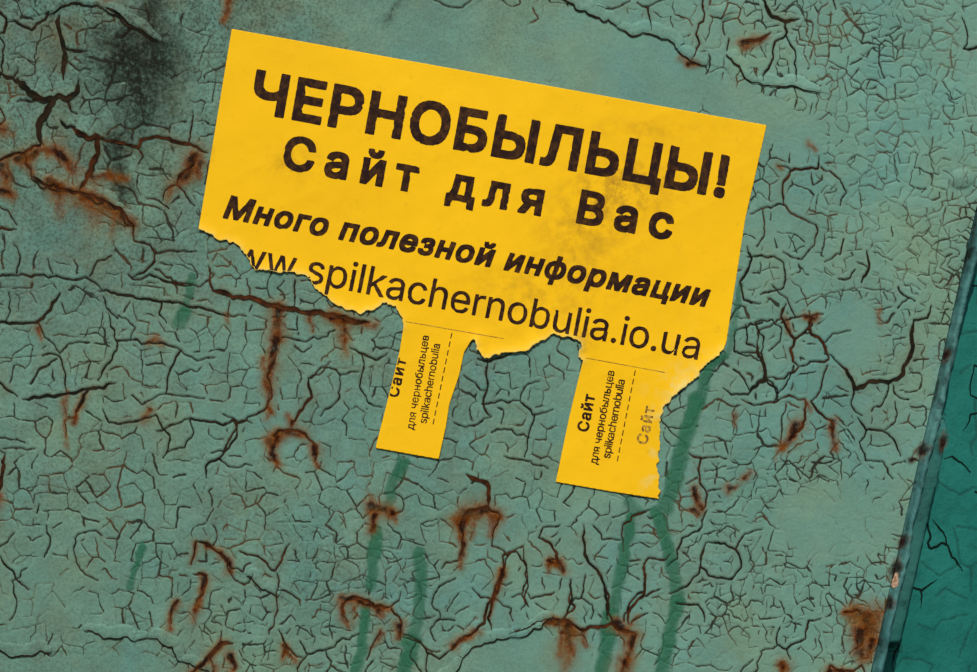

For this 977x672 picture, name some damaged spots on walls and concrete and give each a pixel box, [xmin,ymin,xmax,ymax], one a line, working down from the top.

crack [727,0,800,81]
corrosion [0,144,76,199]
crack [0,7,370,478]
corrosion [262,301,283,417]
corrosion [265,415,319,467]
crack [273,348,388,460]
crack [455,354,552,469]
crack [723,161,932,479]
corrosion [367,499,397,533]
crack [170,454,762,672]
corrosion [452,504,503,569]
corrosion [825,597,894,672]